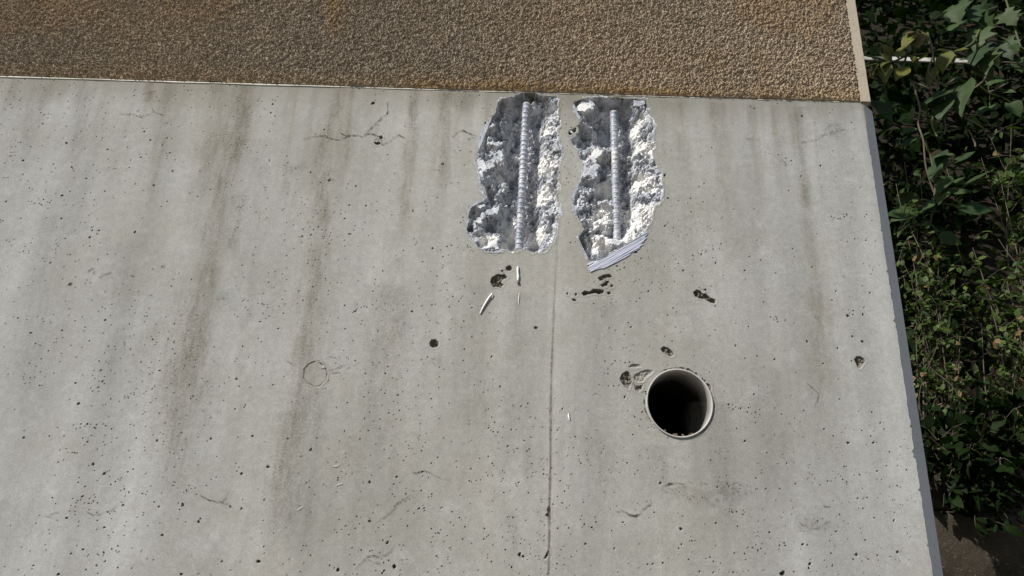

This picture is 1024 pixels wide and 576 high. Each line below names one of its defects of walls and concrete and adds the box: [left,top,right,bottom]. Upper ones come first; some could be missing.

crack [307,106,402,145]
spalling [464,91,665,272]